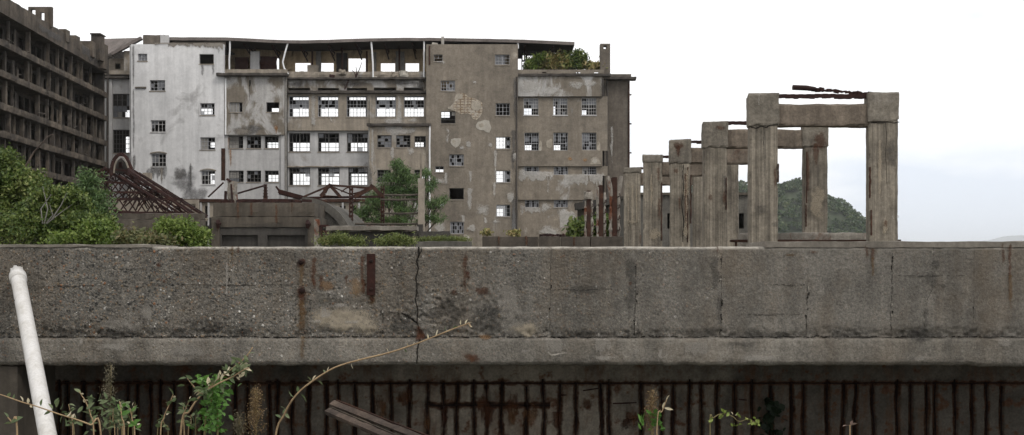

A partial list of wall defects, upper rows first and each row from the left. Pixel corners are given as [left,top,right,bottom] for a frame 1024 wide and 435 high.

leakage [133,91,207,199]
spalling [448,93,491,133]
crack [8,247,1024,364]
rust [473,379,643,435]